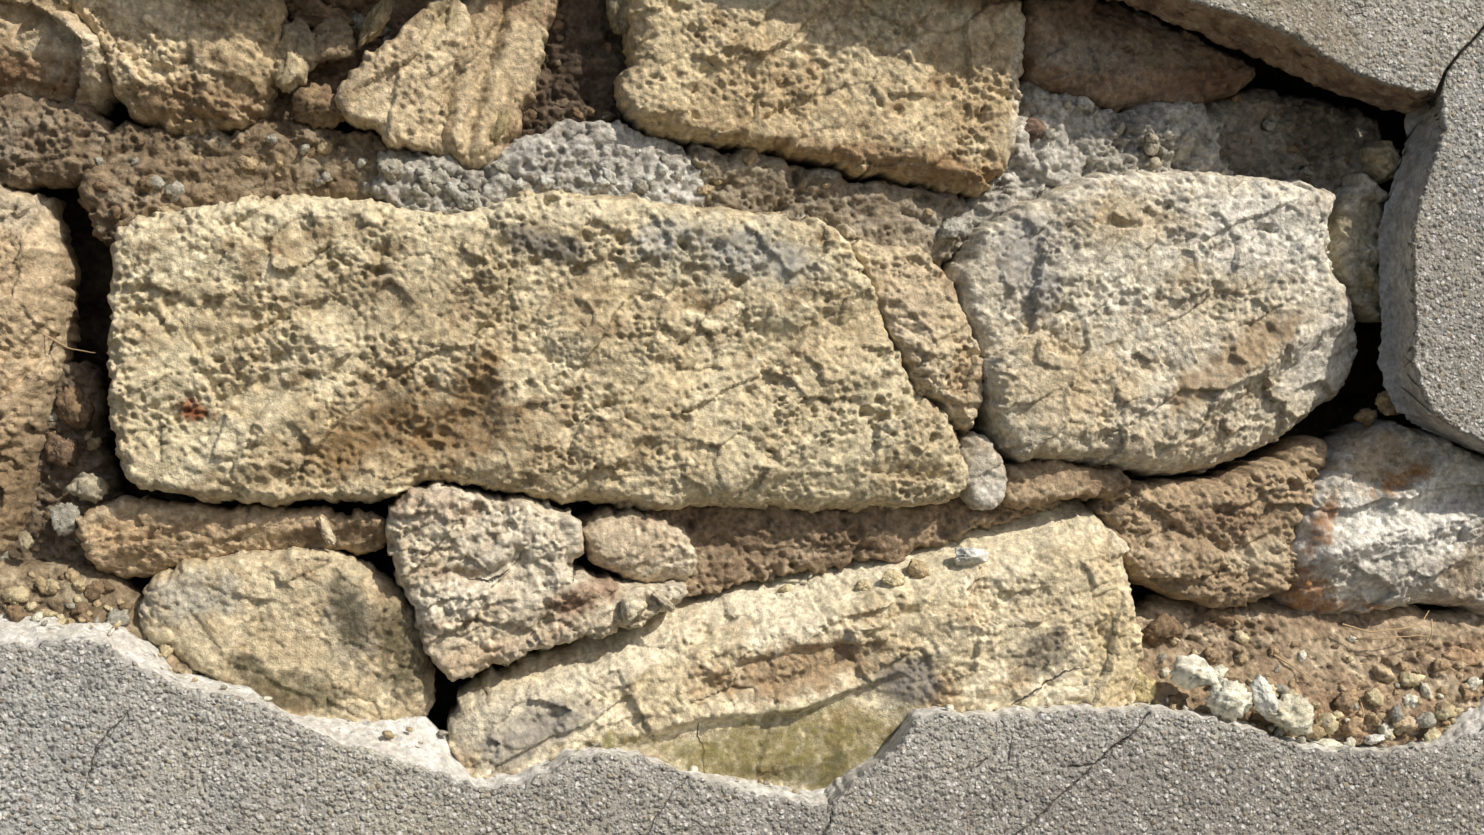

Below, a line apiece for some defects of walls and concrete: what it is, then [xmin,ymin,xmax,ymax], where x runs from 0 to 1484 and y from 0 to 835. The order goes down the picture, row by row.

crack [1422,24,1484,99]
flaking render [1105,0,1484,455]
flaking render [0,614,1484,806]
crack [1016,713,1148,835]